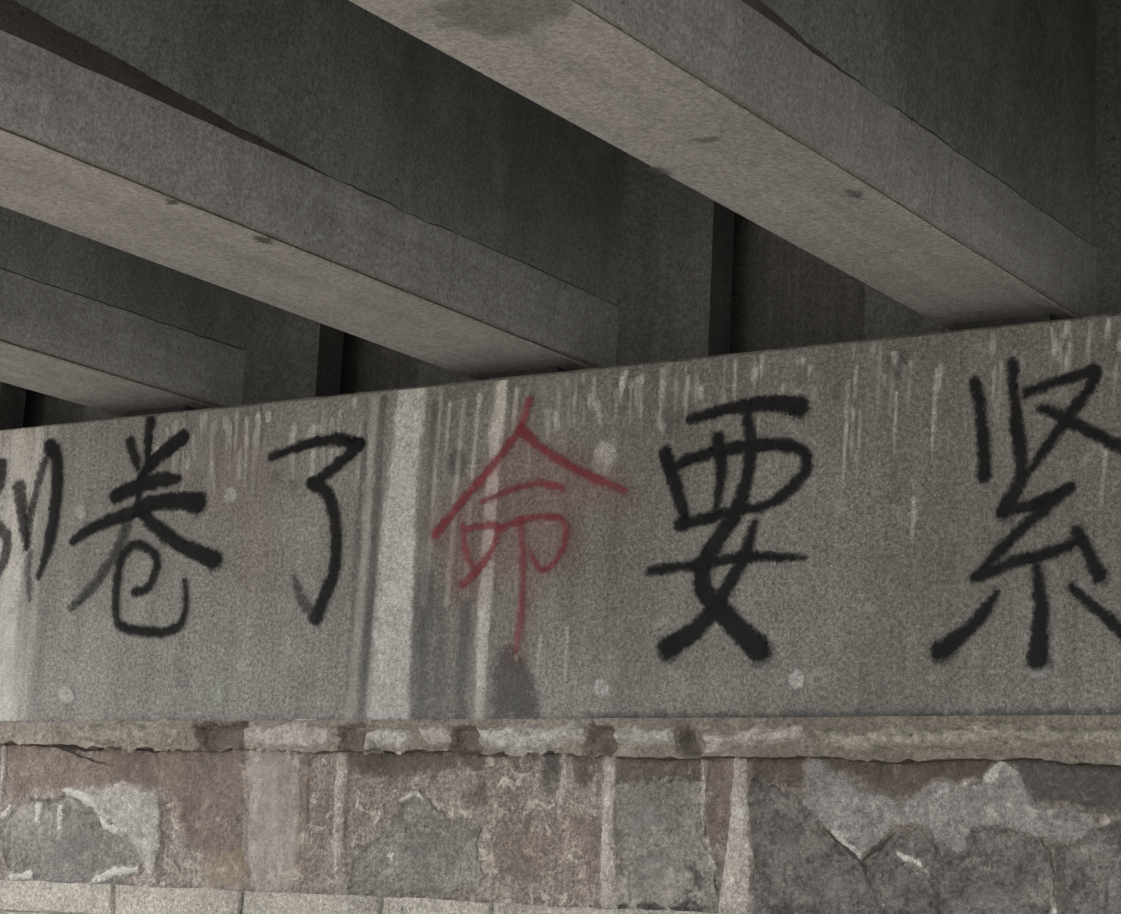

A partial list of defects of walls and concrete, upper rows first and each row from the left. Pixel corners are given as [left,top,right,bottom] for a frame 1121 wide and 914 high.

damp [0,427,43,721]
damp [368,388,427,720]
damp [458,380,507,677]
spalling [0,783,160,884]
spalling [747,757,1121,914]